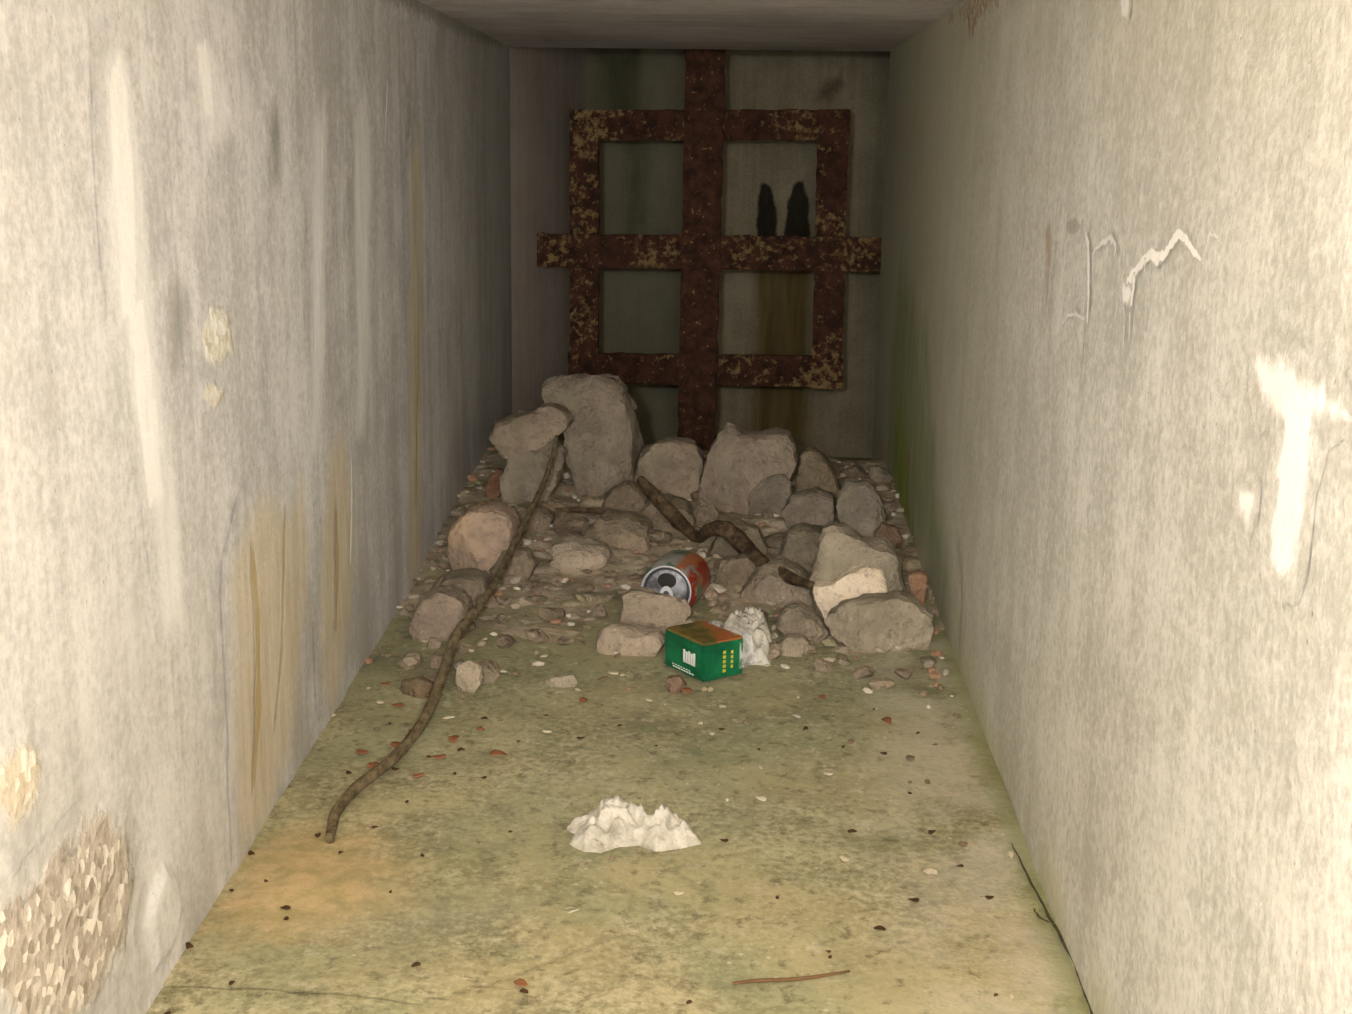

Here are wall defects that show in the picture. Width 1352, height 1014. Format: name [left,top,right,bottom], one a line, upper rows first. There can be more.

crack [1062,210,1221,379]
spalling [0,720,141,1014]